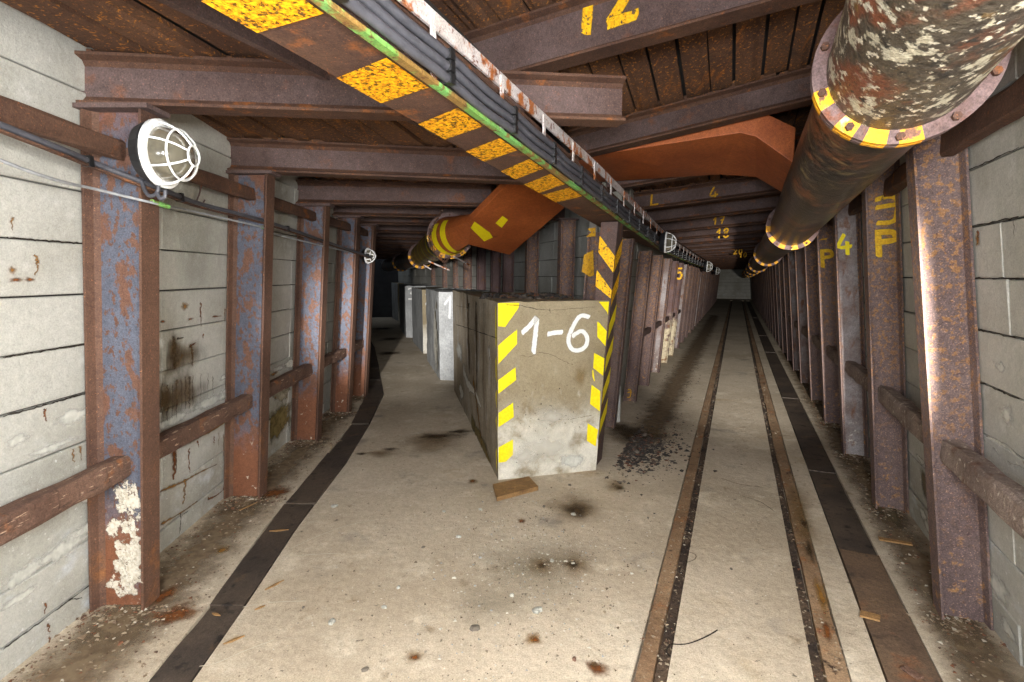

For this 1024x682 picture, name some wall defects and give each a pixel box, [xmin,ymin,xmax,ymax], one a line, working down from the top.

corrosion [10,254,39,281]
water stain [159,337,226,429]
corrosion [160,423,224,525]
peeling [106,480,141,598]